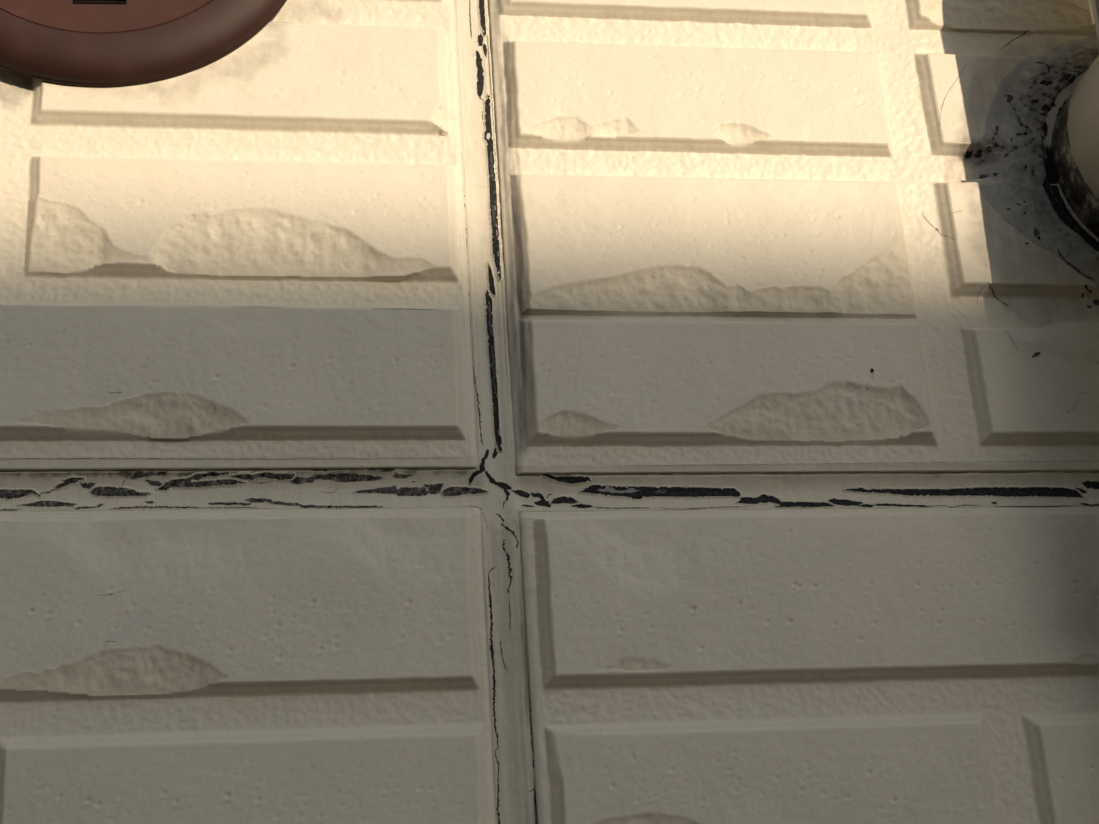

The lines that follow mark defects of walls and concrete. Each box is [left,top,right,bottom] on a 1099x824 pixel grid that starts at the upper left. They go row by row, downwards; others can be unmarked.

spalling [921,0,1092,31]
spalling [529,117,637,141]
spalling [712,123,766,144]
spalling [25,196,432,277]
spalling [526,235,920,316]
crack [0,0,1099,626]
spalling [19,378,245,438]
spalling [538,413,614,436]
spalling [705,368,930,442]
spalling [0,644,225,696]
crack [488,567,506,824]
crack [529,698,538,824]